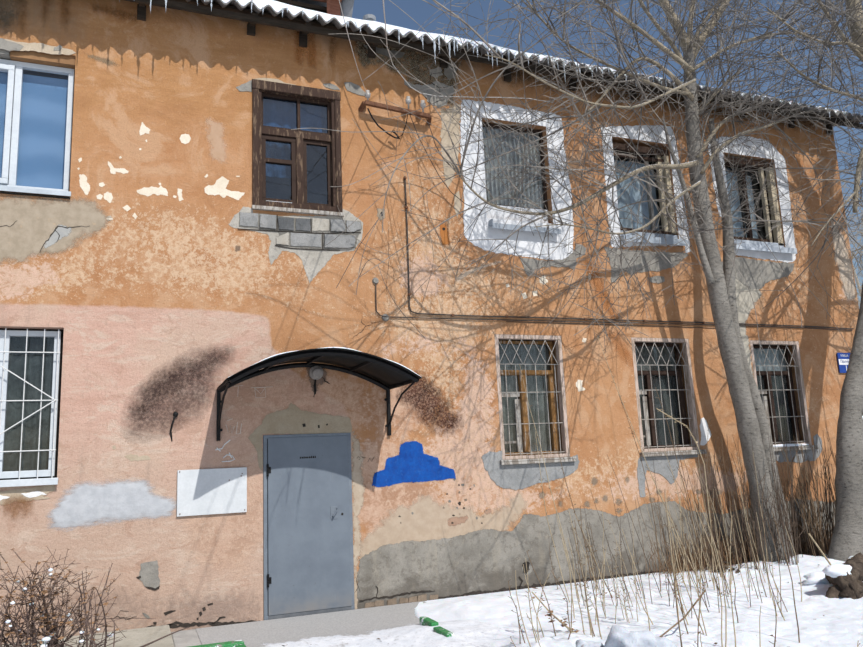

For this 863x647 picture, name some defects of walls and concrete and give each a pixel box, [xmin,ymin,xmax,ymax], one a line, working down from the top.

flaking render [0,158,113,262]
crack [40,226,89,252]
peeling [108,156,129,174]
peeling [137,183,184,201]
spalling [204,174,363,283]
flaking render [735,278,762,376]
spalling [357,478,757,609]
spalling [785,498,836,554]
spalling [136,560,160,590]